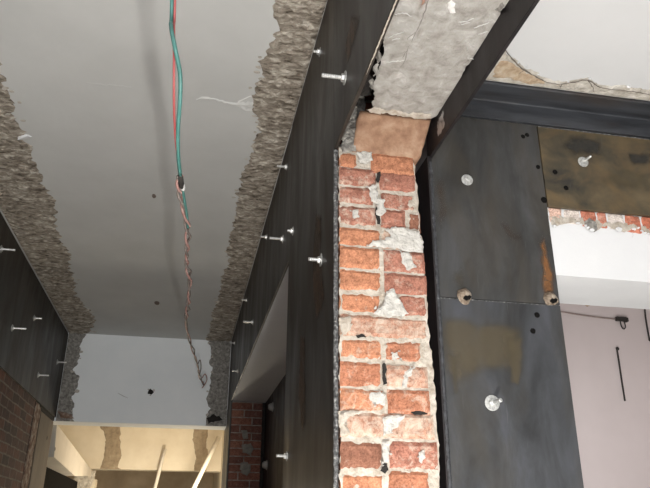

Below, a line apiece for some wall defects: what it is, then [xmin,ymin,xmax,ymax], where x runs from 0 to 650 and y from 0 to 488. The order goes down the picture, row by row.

crack [506,51,649,95]
flaking render [0,74,96,421]
flaking render [192,0,327,471]
rust [541,243,553,292]
flaking render [547,208,650,234]